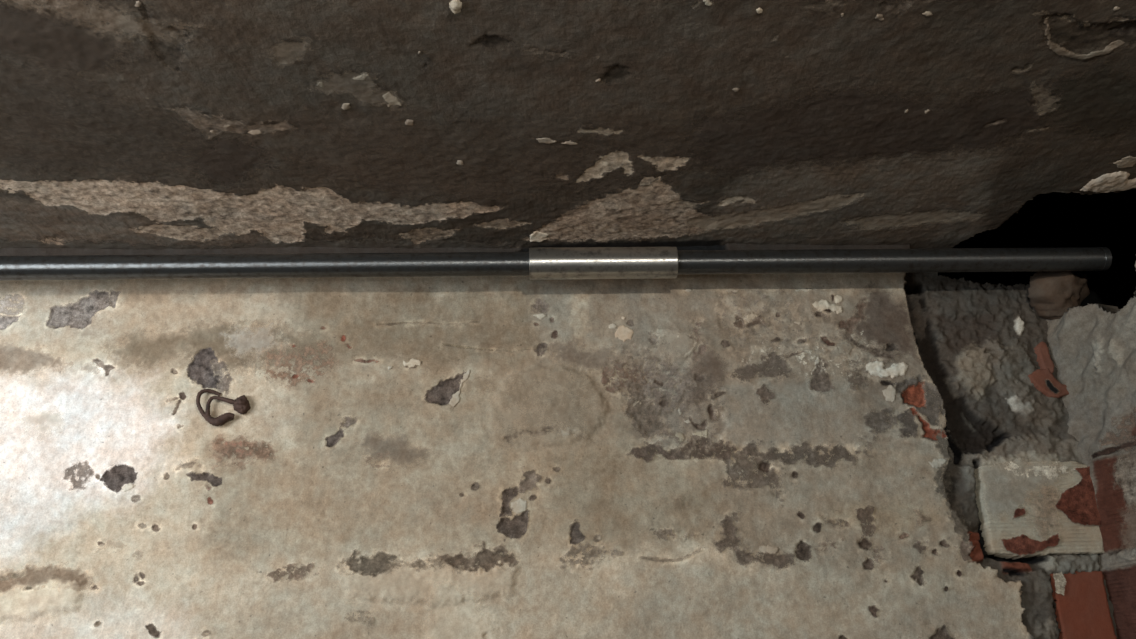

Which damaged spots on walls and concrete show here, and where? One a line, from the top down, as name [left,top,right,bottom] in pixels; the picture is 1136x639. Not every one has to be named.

peeling [0,0,1136,136]
peeling [0,80,1136,256]
peeling [0,188,1136,639]